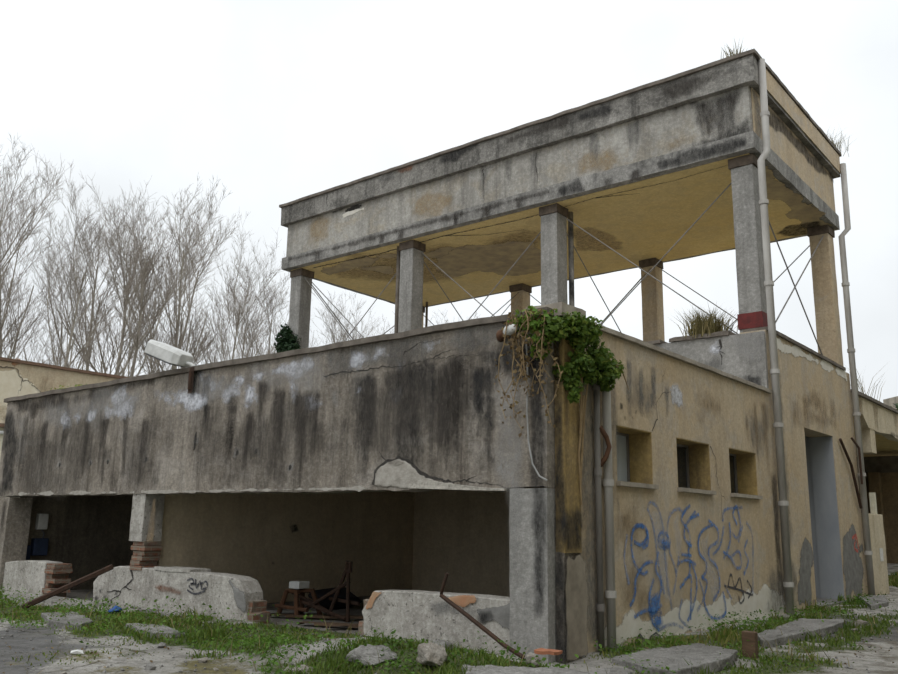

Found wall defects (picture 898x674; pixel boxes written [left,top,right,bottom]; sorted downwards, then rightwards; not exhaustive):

damp [507,106,610,142]
damp [659,91,749,167]
damp [441,144,474,162]
damp [516,180,582,206]
damp [333,212,463,250]
peeling [777,338,847,381]
peeling [0,358,40,423]
damp [166,371,215,419]
damp [223,359,319,459]
damp [0,383,134,495]
spalling [129,455,506,494]
crack [107,570,133,601]